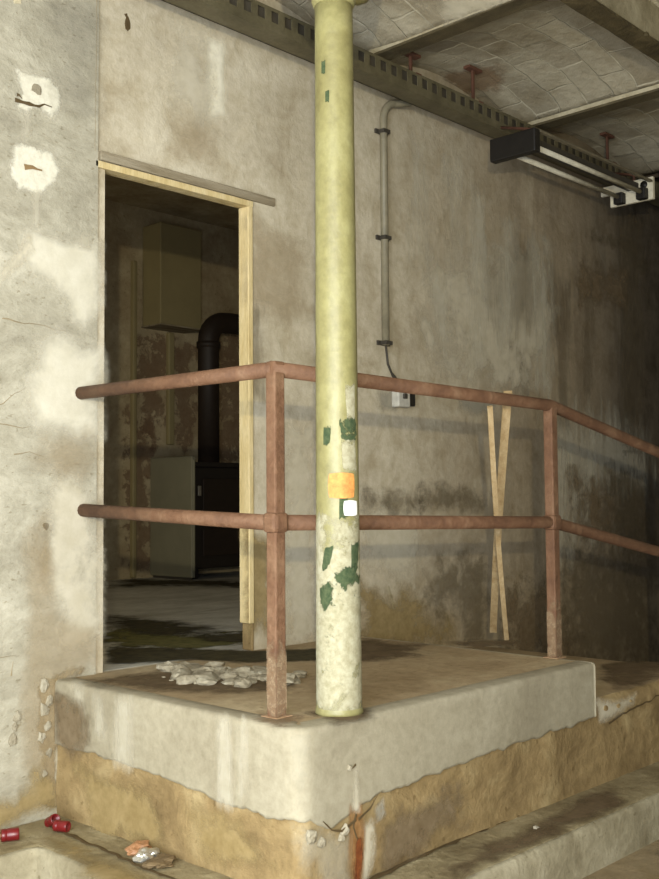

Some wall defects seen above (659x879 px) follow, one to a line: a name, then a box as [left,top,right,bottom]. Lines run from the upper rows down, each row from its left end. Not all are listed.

peeling [15,84,52,108]
peeling [323,385,357,471]
peeling [266,429,418,717]
spalling [597,699,633,720]
corrosion [350,788,364,879]